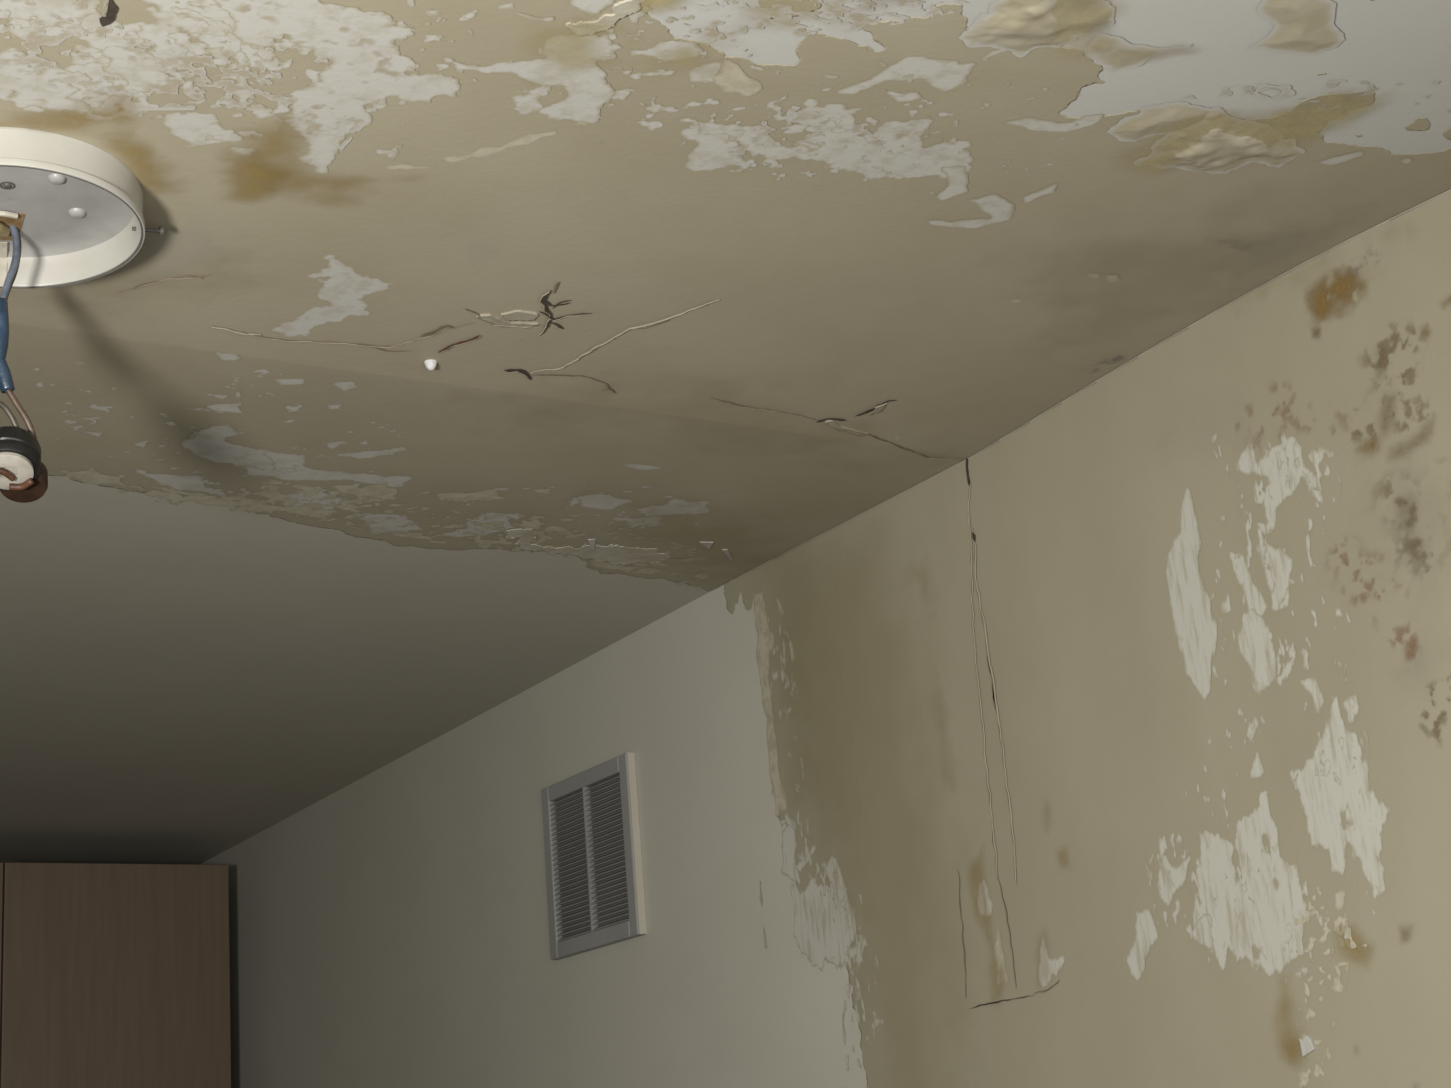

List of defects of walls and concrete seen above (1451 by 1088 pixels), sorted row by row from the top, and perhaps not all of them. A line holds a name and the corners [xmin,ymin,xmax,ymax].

crack [211,282,719,393]
peeling [0,0,1451,592]
crack [710,398,1059,1009]
peeling [724,190,1451,1088]
water stain [1377,334,1406,367]